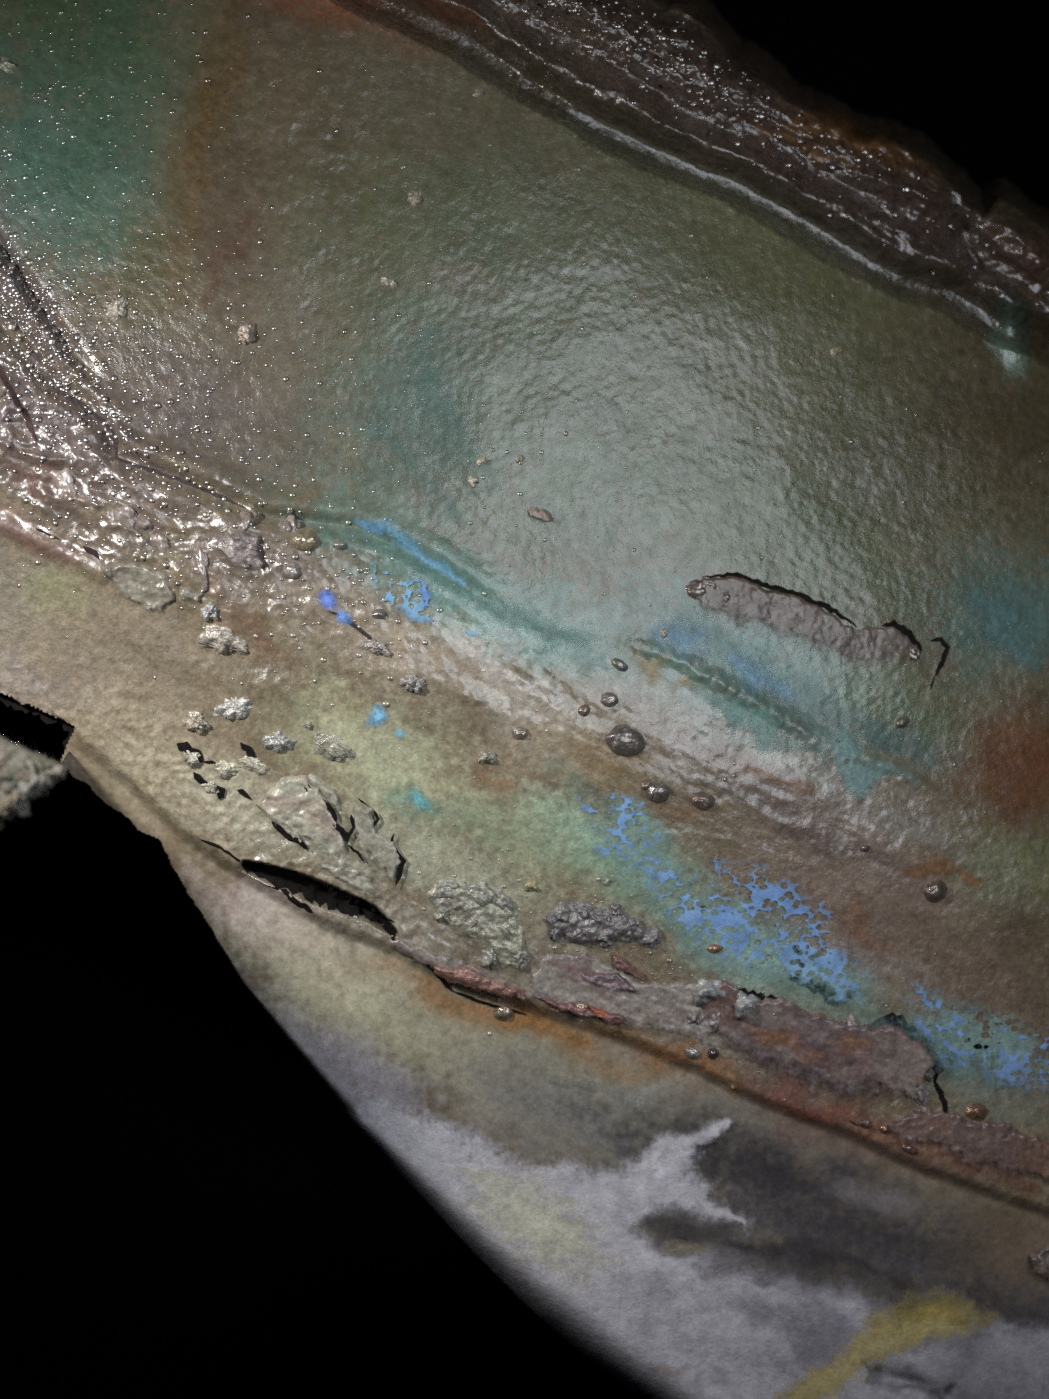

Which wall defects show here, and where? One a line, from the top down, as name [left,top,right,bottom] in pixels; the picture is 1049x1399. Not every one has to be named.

spalling [0,730,69,831]
peeling [281,826,305,843]
crack [200,785,406,941]
peeling [308,774,402,897]
crack [426,964,527,1015]
corrosion [889,1106,1049,1181]
damp [345,1094,1049,1399]